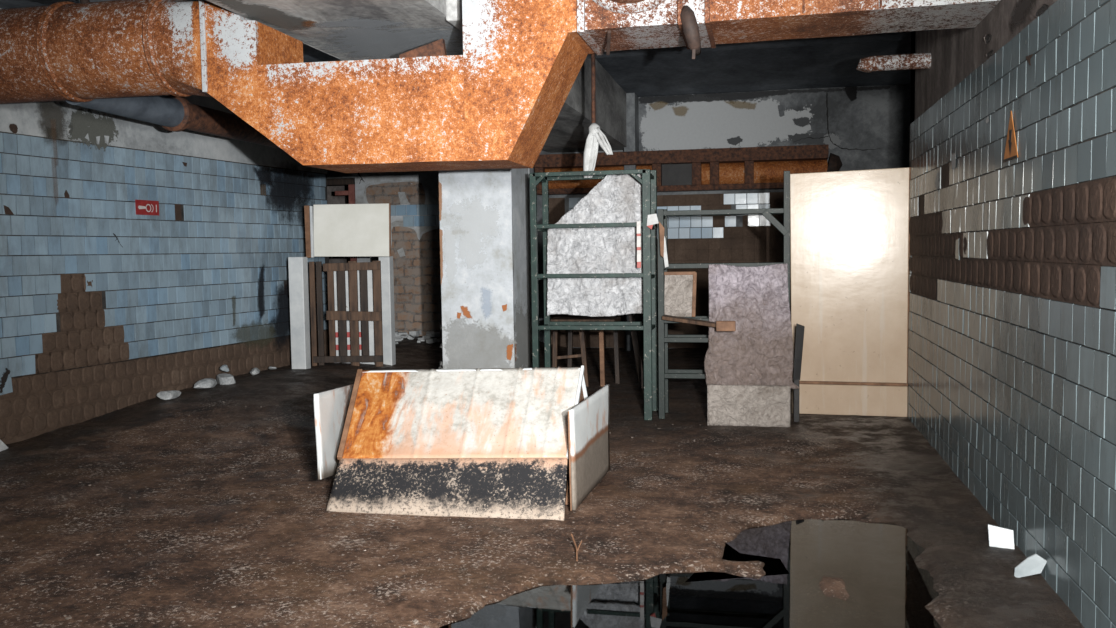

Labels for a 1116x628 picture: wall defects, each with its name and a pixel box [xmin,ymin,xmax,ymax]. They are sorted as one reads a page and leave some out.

corrosion [186,103,281,149]
flaking render [639,94,830,151]
damp [254,168,272,185]
spalling [940,162,950,189]
peeling [909,176,1116,308]
peeling [0,273,292,441]
peeling [310,330,329,361]